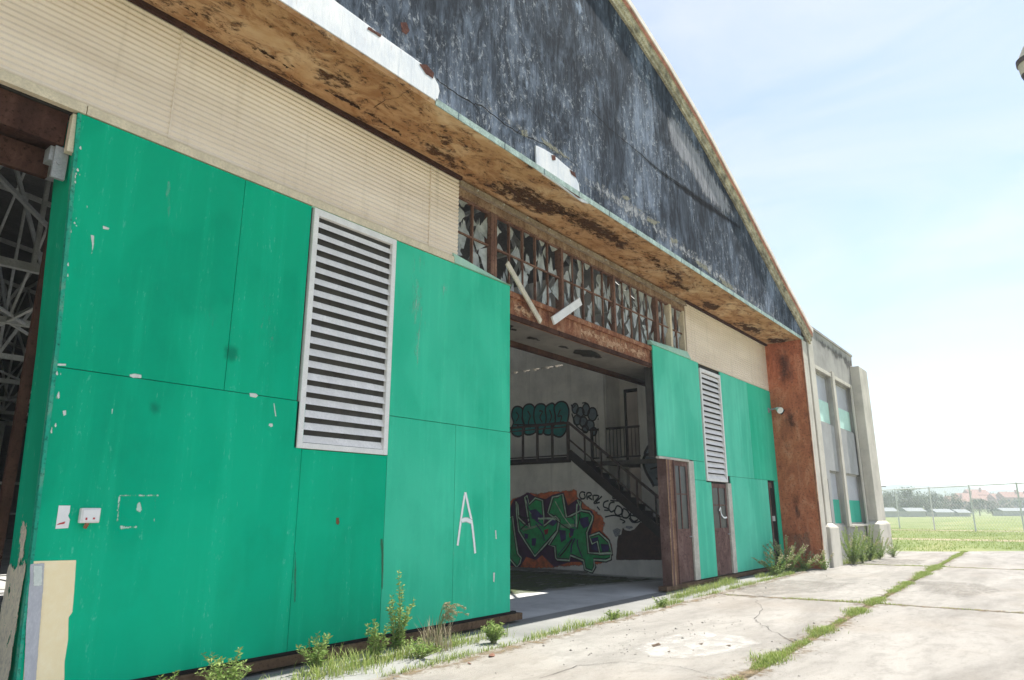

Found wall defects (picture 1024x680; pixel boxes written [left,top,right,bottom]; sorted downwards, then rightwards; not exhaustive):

leakage [315,69,401,135]
crack [437,79,577,166]
leakage [418,135,472,177]
leakage [648,161,738,227]
leakage [484,181,690,291]
rust [580,329,645,359]
leakage [736,322,786,343]
peeling [0,516,76,680]